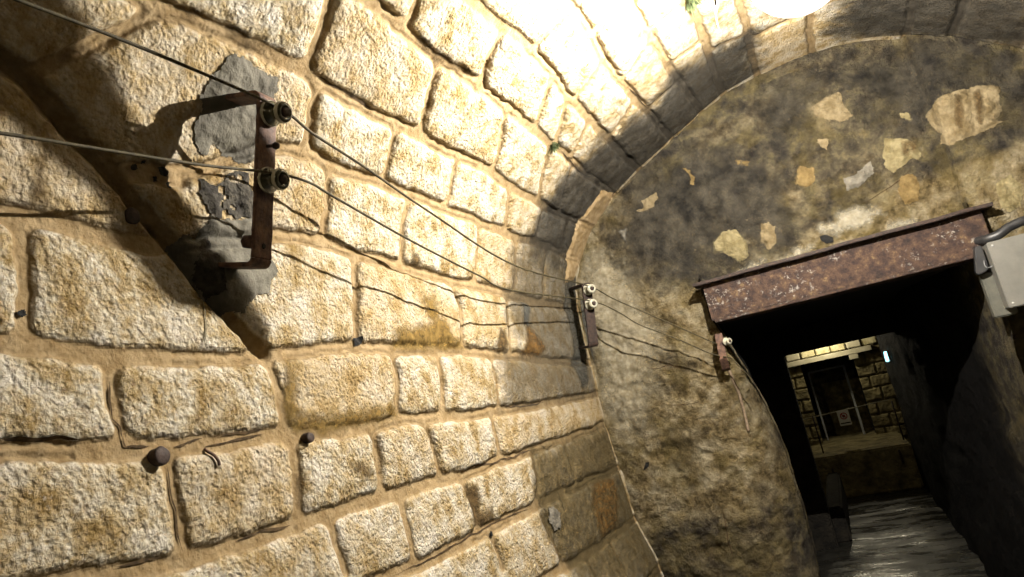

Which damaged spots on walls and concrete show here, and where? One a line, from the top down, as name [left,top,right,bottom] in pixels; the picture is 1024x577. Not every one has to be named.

damp [766,68,897,143]
spalling [810,92,853,122]
spalling [926,85,1003,146]
spalling [794,166,815,187]
spalling [843,138,921,205]
flaking render [636,192,658,212]
damp [819,207,879,235]
spalling [713,222,777,263]
damp [531,253,662,577]